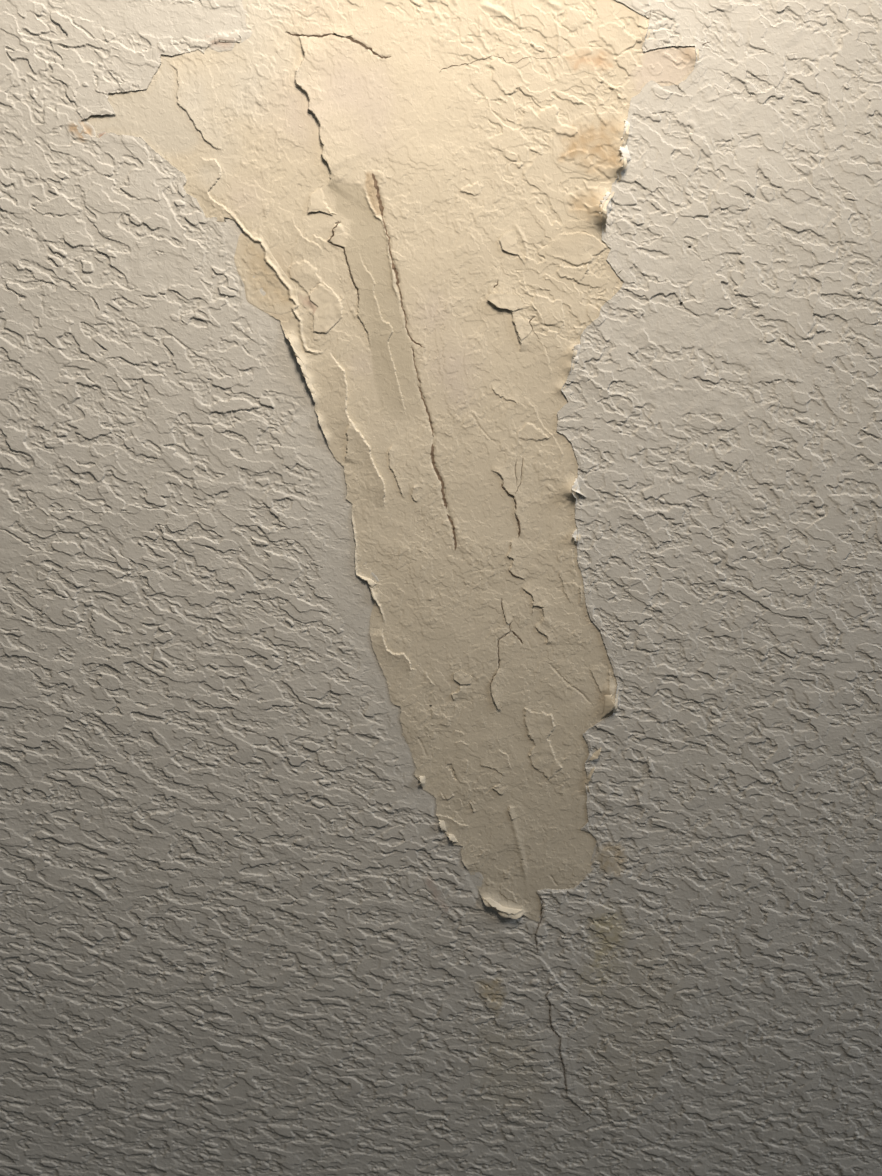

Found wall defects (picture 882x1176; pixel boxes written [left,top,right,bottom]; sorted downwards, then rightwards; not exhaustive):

peeling [71,0,703,922]
crack [545,987,610,1139]